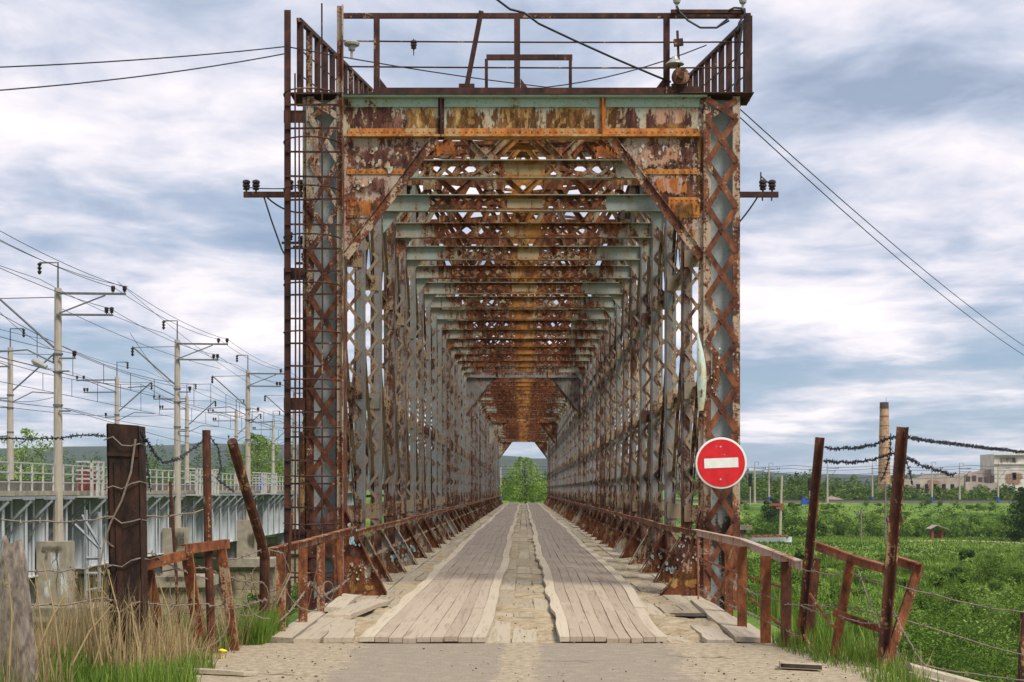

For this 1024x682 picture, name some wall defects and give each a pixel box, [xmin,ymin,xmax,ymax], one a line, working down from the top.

peeling [351,146,401,190]
rust [390,155,409,169]
peeling [633,113,703,233]
rust [350,177,390,245]
rust [347,536,364,561]
peeling [650,529,697,575]
rust [669,569,697,589]